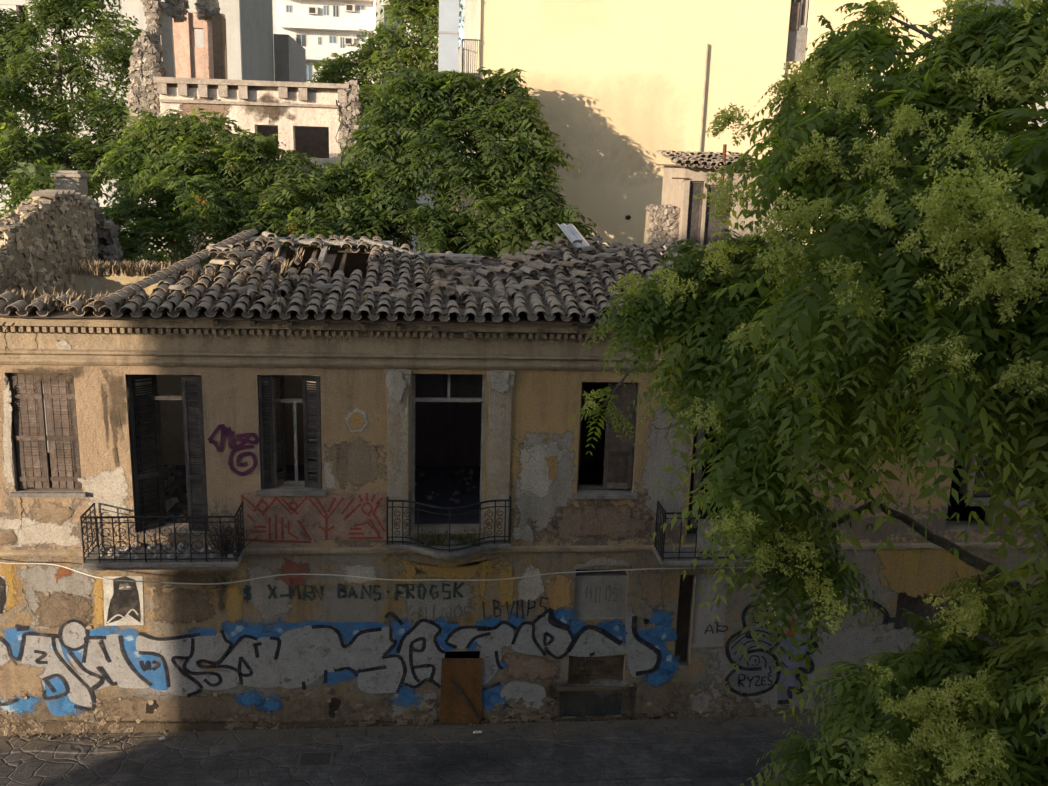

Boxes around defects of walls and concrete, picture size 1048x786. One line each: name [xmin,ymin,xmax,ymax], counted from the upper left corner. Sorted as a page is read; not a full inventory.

damp [101,370,127,466]
flaking render [77,467,129,521]
flaking render [323,459,337,490]
flaking render [512,431,576,542]
flaking render [642,405,690,528]
flaking render [0,514,81,548]
flaking render [0,562,18,612]
spalling [35,578,104,630]
flaking render [496,556,631,611]